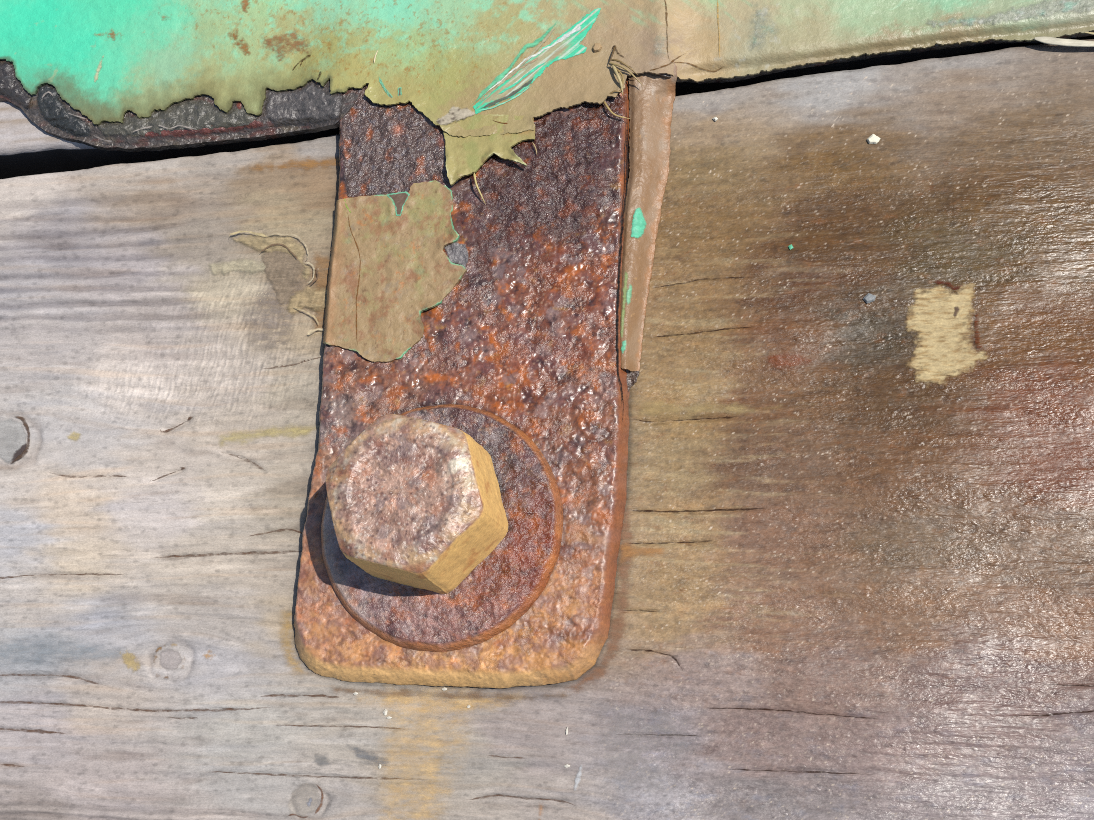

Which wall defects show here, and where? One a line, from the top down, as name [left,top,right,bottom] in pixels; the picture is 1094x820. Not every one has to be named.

rust [266,33,307,60]
rust [0,61,342,142]
peeling [234,62,677,420]
peeling [906,280,988,384]